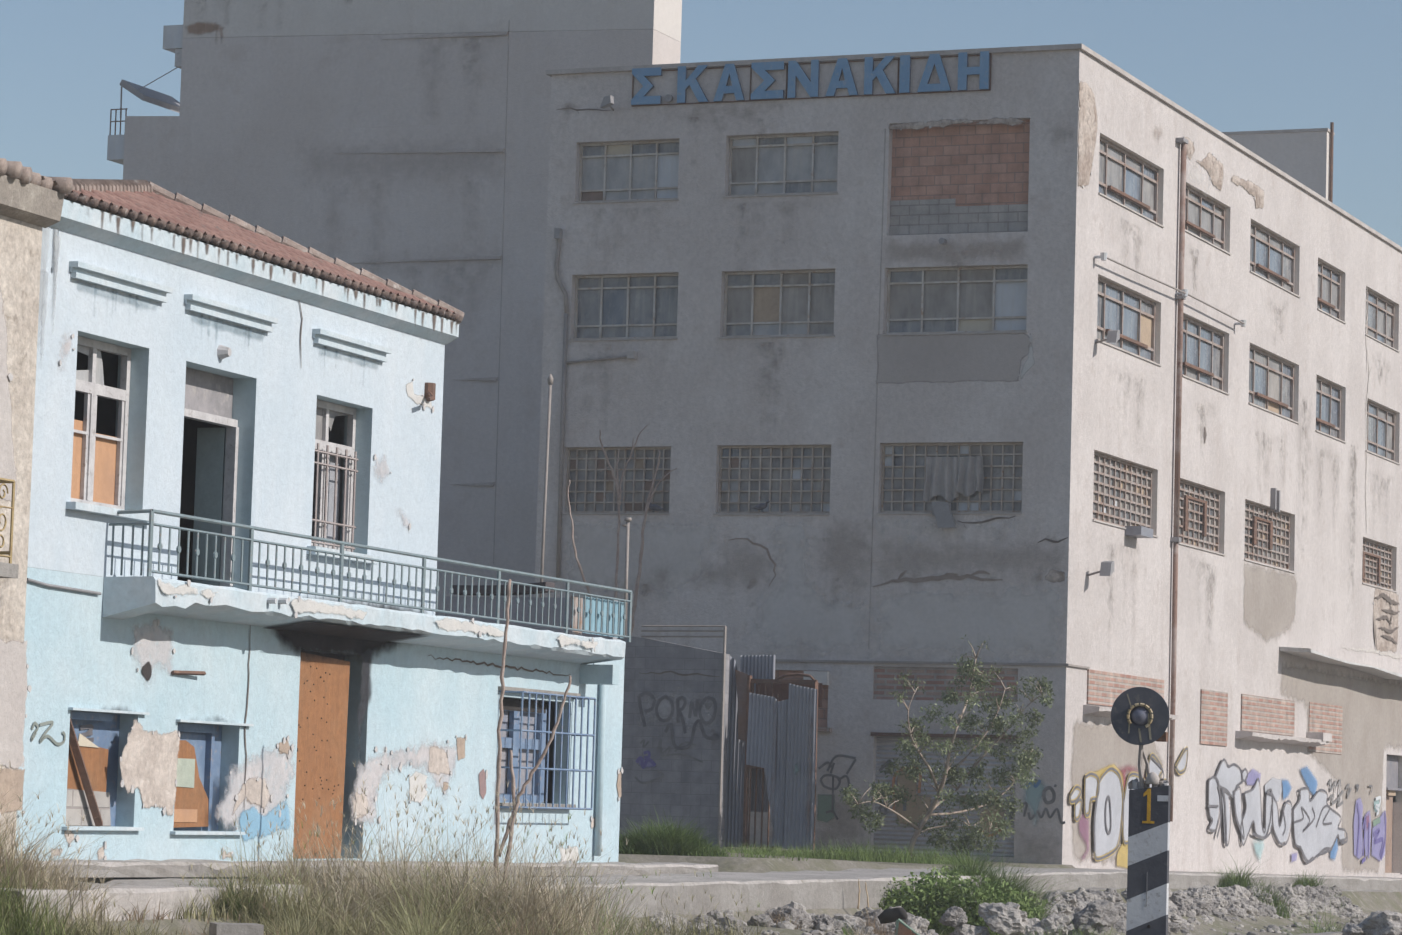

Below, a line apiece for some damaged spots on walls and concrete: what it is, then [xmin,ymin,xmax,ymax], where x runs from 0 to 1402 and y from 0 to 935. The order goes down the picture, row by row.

spalling [1184,136,1264,209]
crack [730,538,776,586]
crack [873,570,1003,587]
peeling [288,596,367,619]
crack [428,655,571,676]
peeling [0,768,25,819]
peeling [119,720,180,816]
peeling [218,735,294,830]
peeling [352,734,467,828]